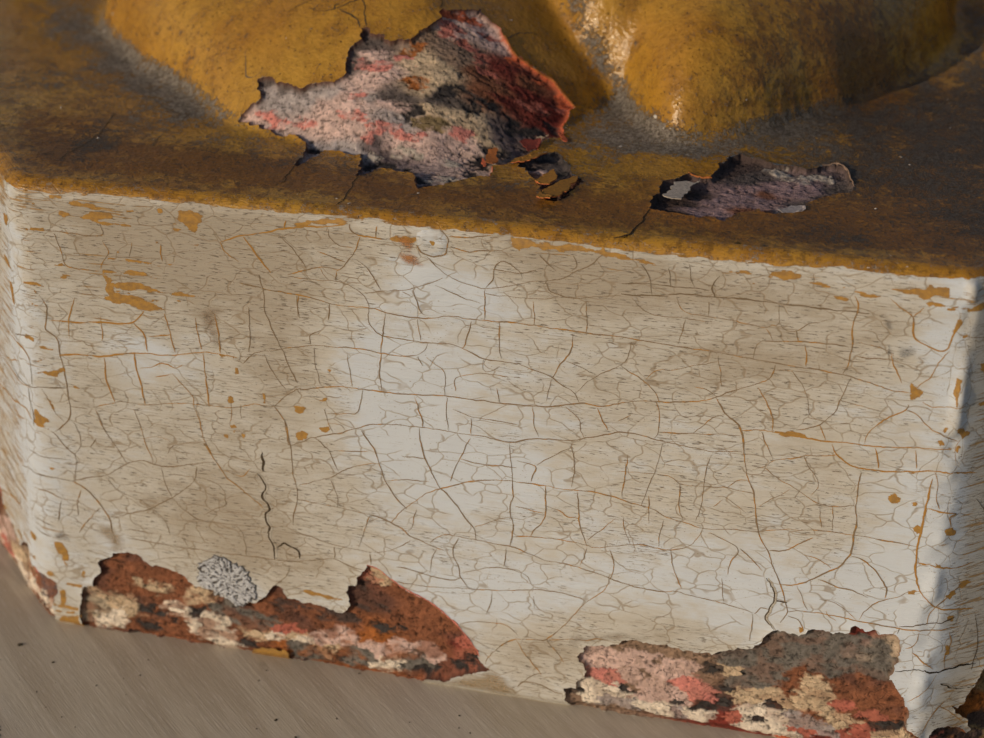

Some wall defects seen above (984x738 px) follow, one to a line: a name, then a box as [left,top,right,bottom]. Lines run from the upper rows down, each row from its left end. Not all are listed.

crack [290,0,367,28]
peeling [238,8,584,201]
peeling [649,153,856,221]
crack [0,171,984,737]
peeling [0,488,58,616]
peeling [79,552,489,682]
peeling [564,626,984,738]